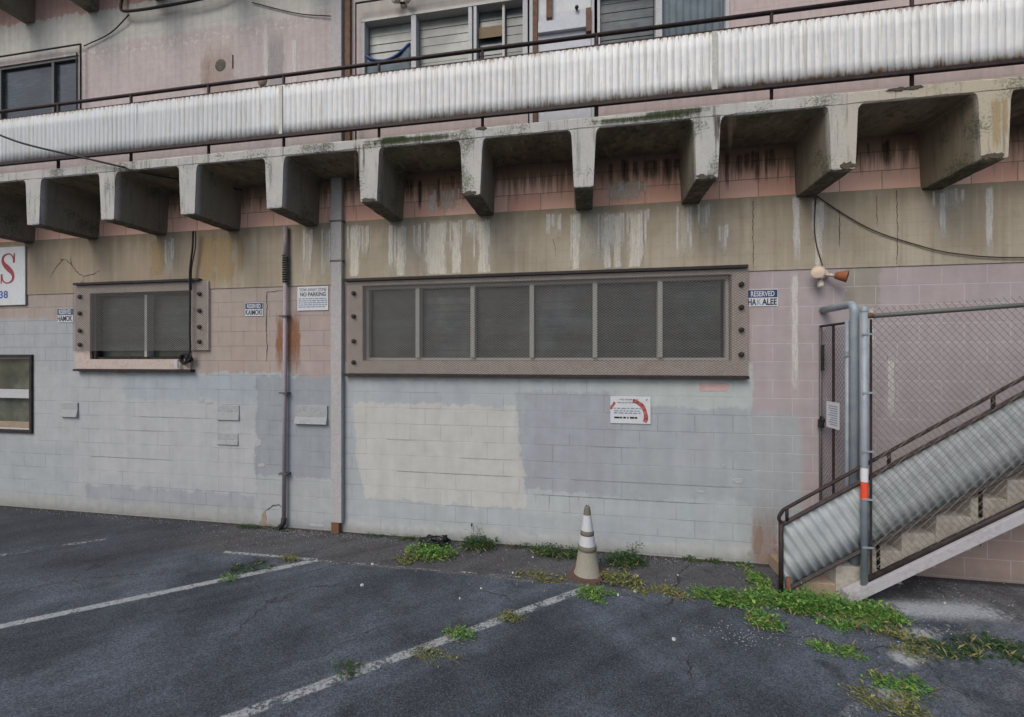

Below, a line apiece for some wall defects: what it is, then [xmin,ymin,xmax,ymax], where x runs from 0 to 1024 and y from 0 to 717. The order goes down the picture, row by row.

leakage [347,225,369,277]
leakage [388,188,491,276]
leakage [546,209,649,270]
leakage [676,204,729,251]
leakage [932,188,964,232]
rust [276,322,300,361]